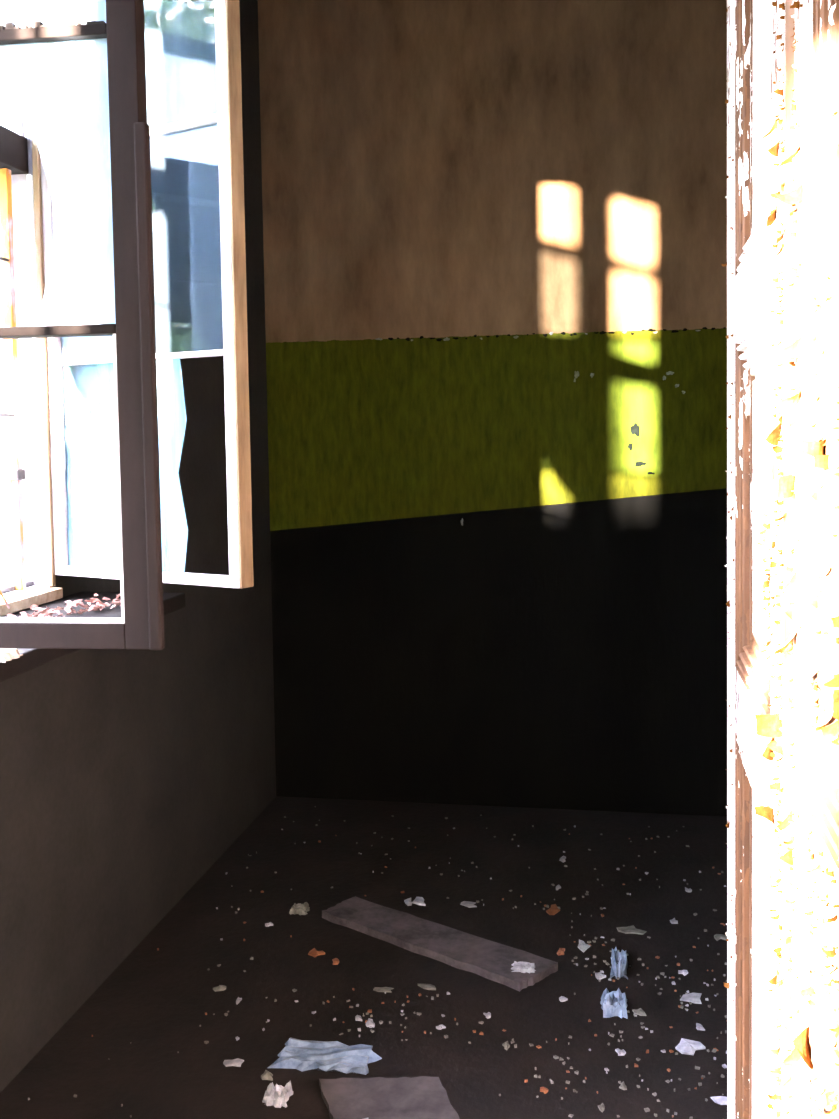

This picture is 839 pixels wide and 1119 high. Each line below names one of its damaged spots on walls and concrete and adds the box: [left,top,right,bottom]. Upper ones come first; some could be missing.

peeling [725,492,735,660]
peeling [754,0,839,1119]